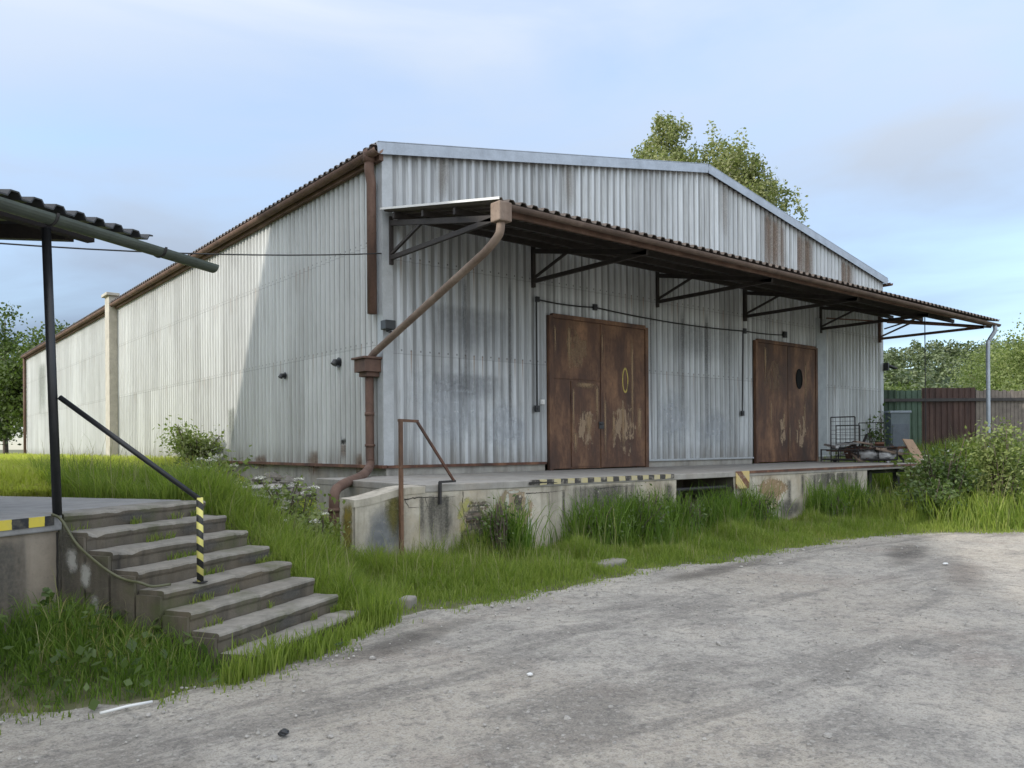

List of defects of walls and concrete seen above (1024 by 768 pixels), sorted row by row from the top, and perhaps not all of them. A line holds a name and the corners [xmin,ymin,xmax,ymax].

peeling [573,349,641,456]
water stain [420,498,451,537]